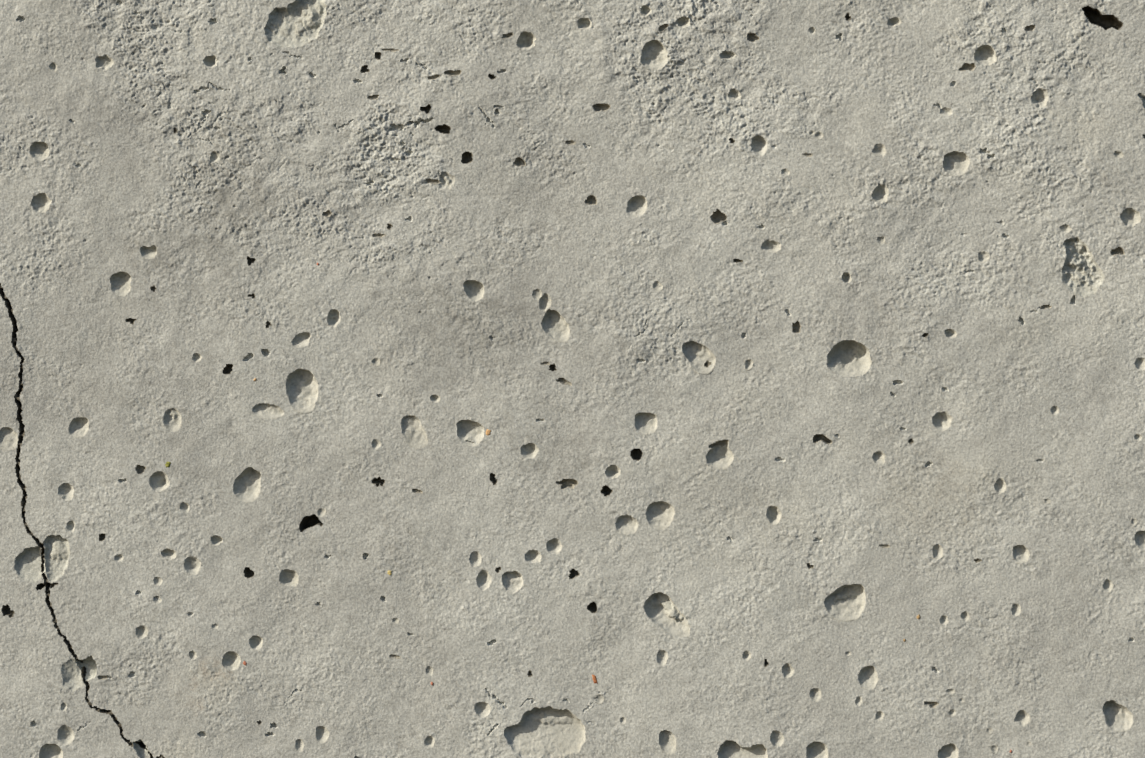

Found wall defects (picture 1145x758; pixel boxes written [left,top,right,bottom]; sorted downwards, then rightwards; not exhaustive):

crack [0,283,165,758]